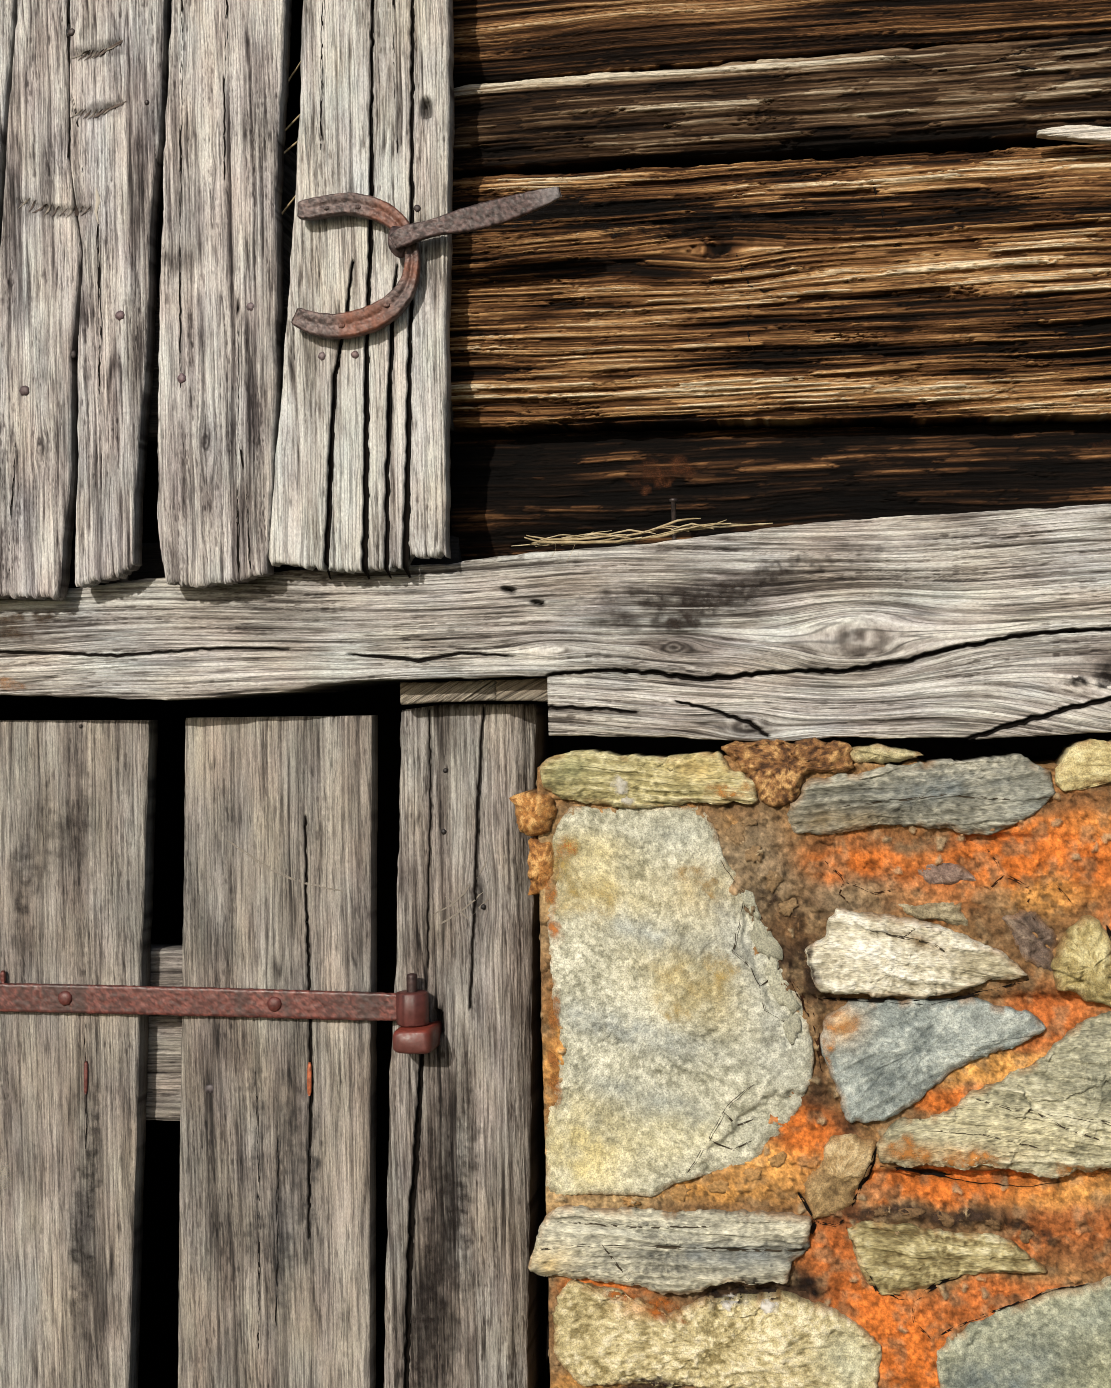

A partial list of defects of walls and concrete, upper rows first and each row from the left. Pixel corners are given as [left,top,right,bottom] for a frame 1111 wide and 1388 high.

crack [318,0,326,150]
crack [324,0,414,580]
crack [0,647,289,657]
crack [349,652,514,663]
crack [548,628,1111,736]
crack [968,697,1111,757]
crack [469,708,485,1008]
crack [254,817,313,1349]
crack [404,1054,423,1388]